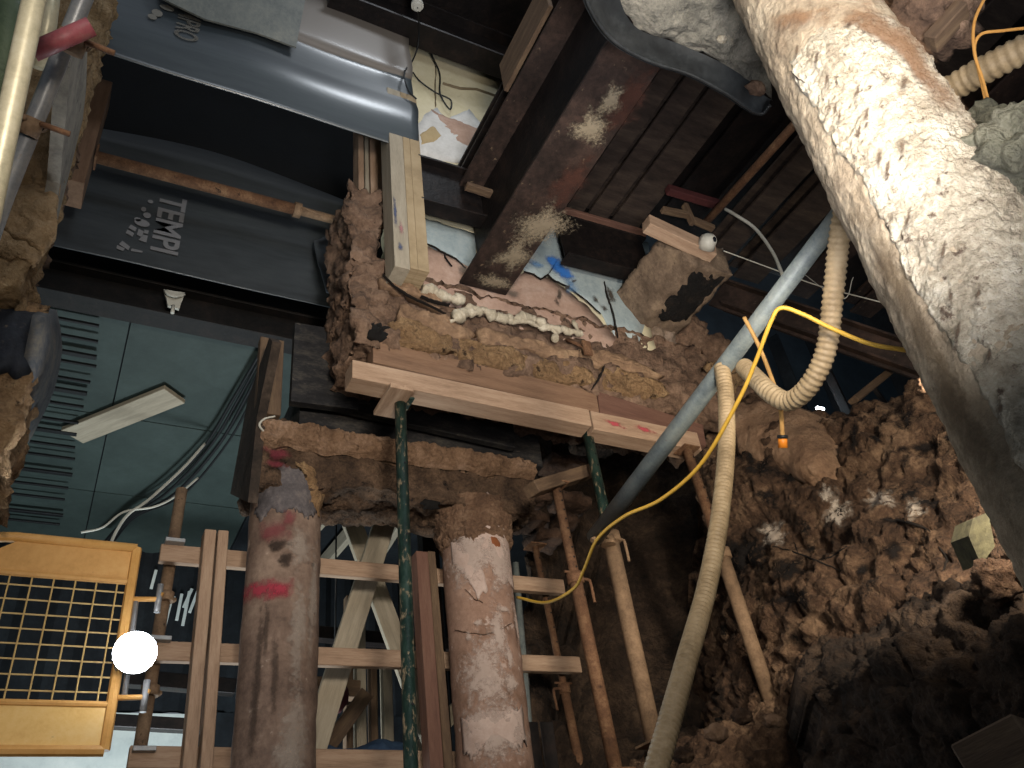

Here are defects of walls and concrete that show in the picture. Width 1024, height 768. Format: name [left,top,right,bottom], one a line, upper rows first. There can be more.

spalling [321,218,707,416]
spalling [408,404,500,423]
spalling [694,392,718,436]
spalling [260,418,647,517]
crack [456,623,512,635]
flaking render [460,606,527,768]